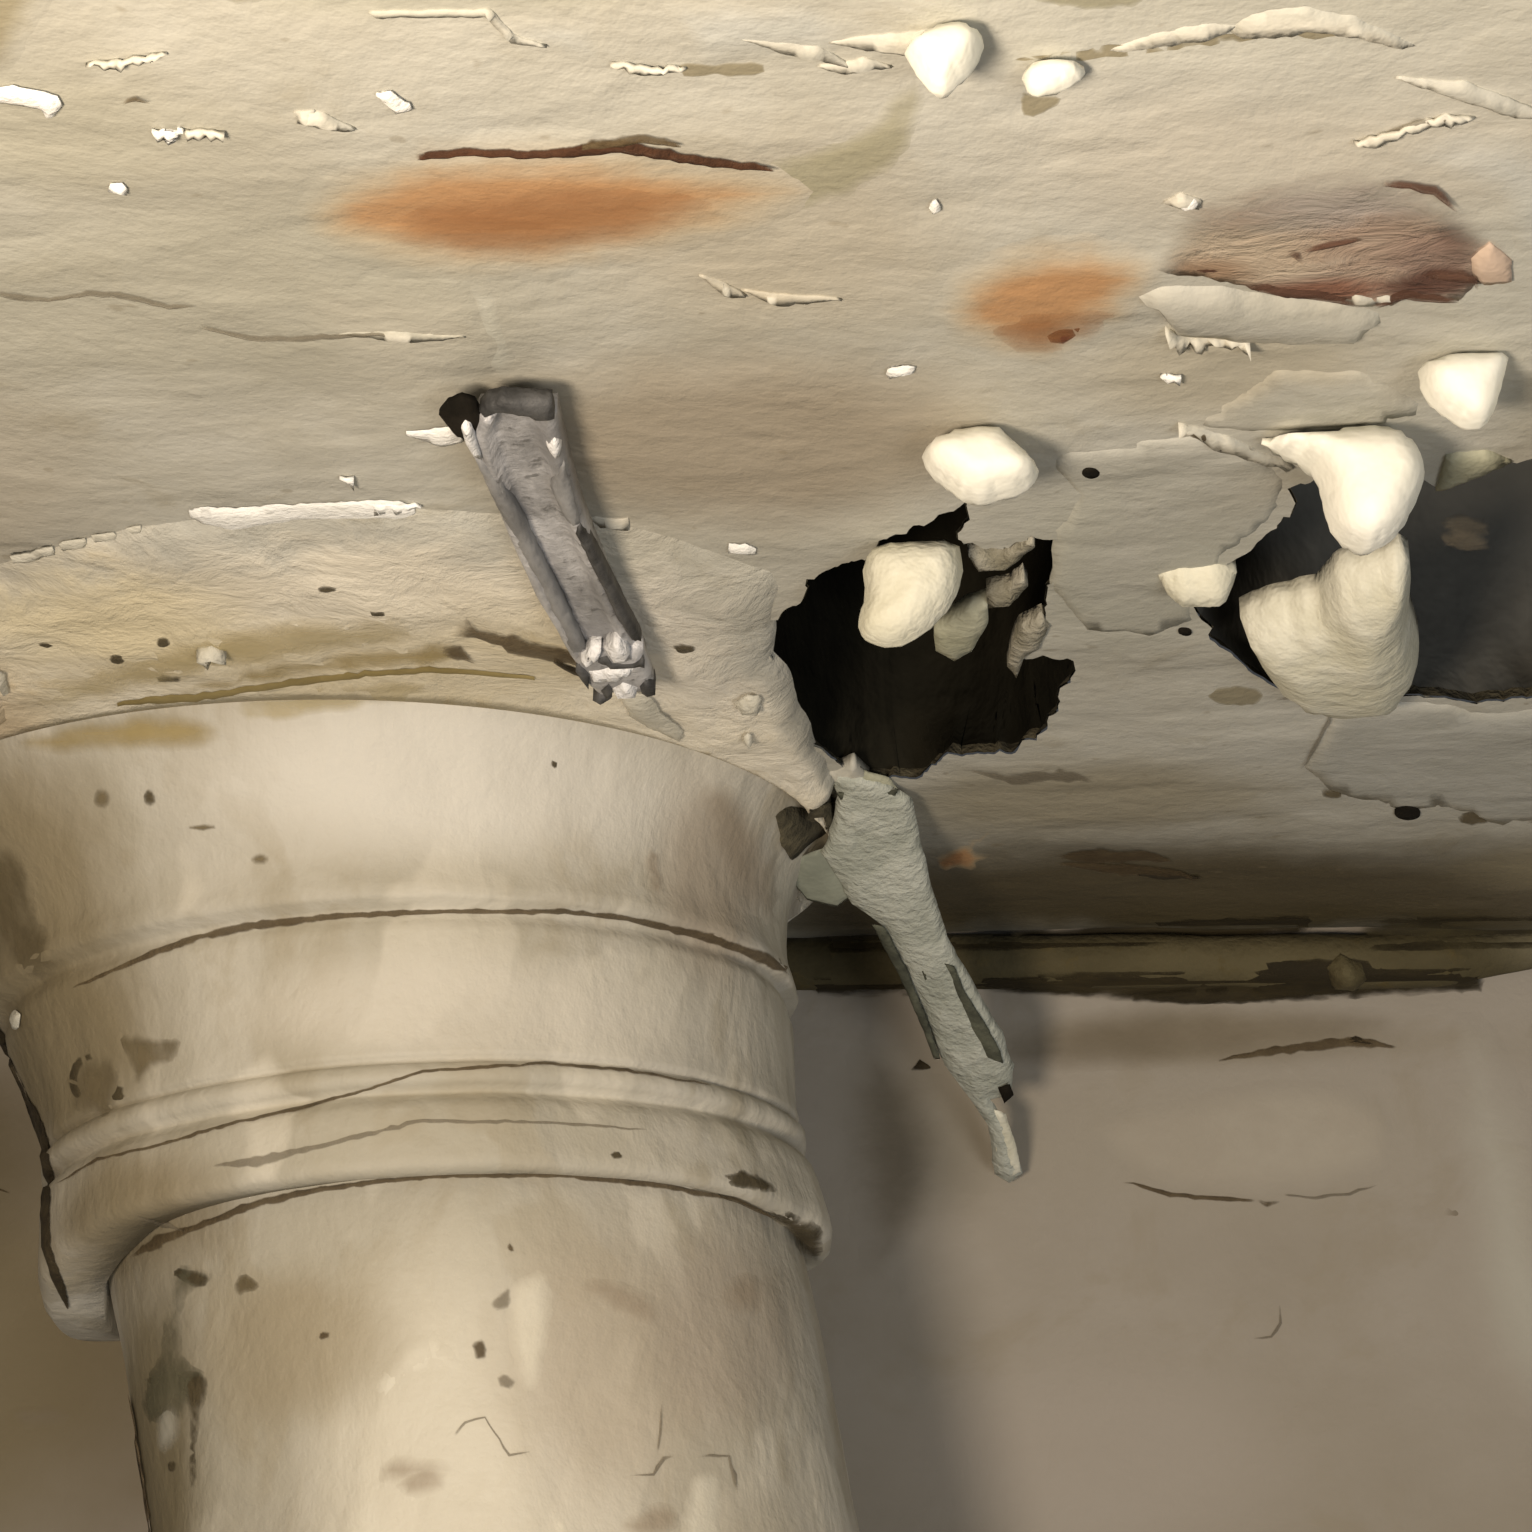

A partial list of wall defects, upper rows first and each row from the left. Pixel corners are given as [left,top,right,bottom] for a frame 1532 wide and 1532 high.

peeling [929,198,941,214]
spalling [1139,76,1532,360]
peeling [886,364,915,379]
spalling [1435,450,1512,491]
peeling [934,370,1419,684]